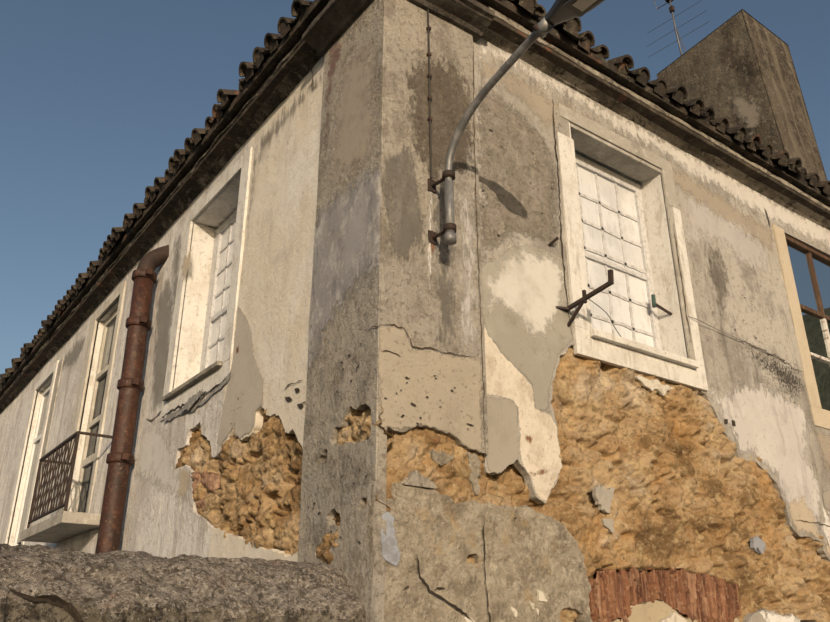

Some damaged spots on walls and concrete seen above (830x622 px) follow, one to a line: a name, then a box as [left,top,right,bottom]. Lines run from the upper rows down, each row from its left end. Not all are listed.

crack [367,128,486,457]
leakage [382,57,476,344]
leakage [485,247,565,335]
flaking render [134,307,321,556]
flaking render [315,512,342,564]
crack [416,517,491,622]
flaking render [337,326,830,622]